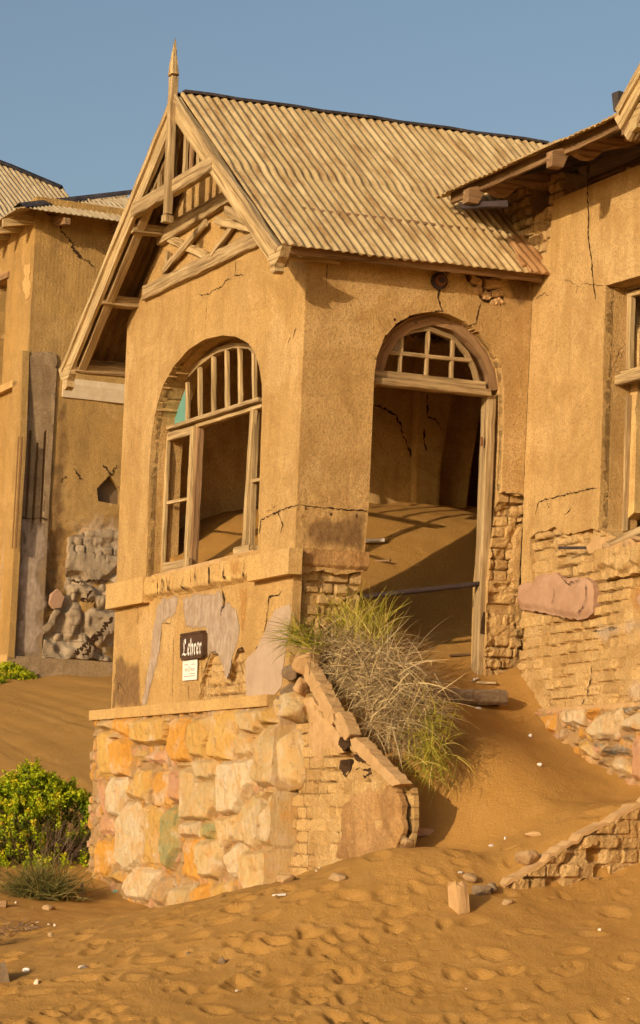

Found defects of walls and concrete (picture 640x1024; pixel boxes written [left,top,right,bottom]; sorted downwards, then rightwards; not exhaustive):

crack [46,213,94,267]
crack [536,161,603,299]
crack [431,272,444,315]
crack [375,395,442,457]
crack [259,505,366,533]
crack [503,488,596,514]
spalling [41,529,118,661]